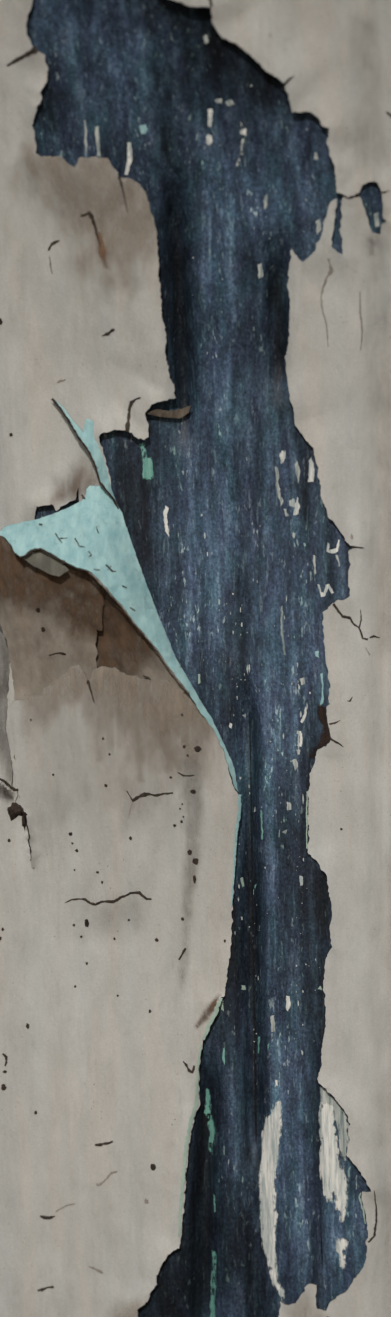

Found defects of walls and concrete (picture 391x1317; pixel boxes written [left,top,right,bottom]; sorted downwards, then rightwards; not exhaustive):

peeling [359,182,387,234]
peeling [35,491,79,519]
crack [332,603,380,655]
damp [28,667,207,736]
crack [126,772,194,817]
crack [65,891,151,906]
peeling [208,1115,216,1144]
peeling [320,1087,350,1161]
peeling [319,1102,348,1222]
peeling [258,1101,285,1301]
peeling [336,1238,348,1269]